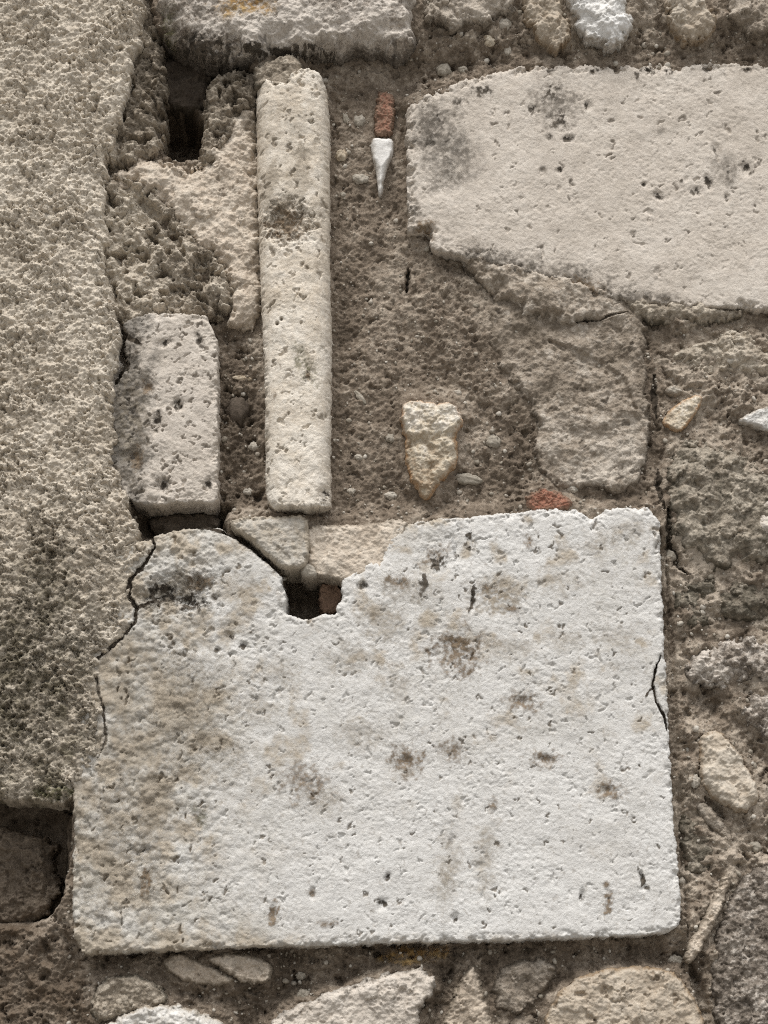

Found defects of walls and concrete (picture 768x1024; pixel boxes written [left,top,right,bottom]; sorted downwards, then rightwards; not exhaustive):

crack [650,374,658,419]
crack [654,468,691,575]
crack [95,538,161,752]
crack [645,655,667,731]